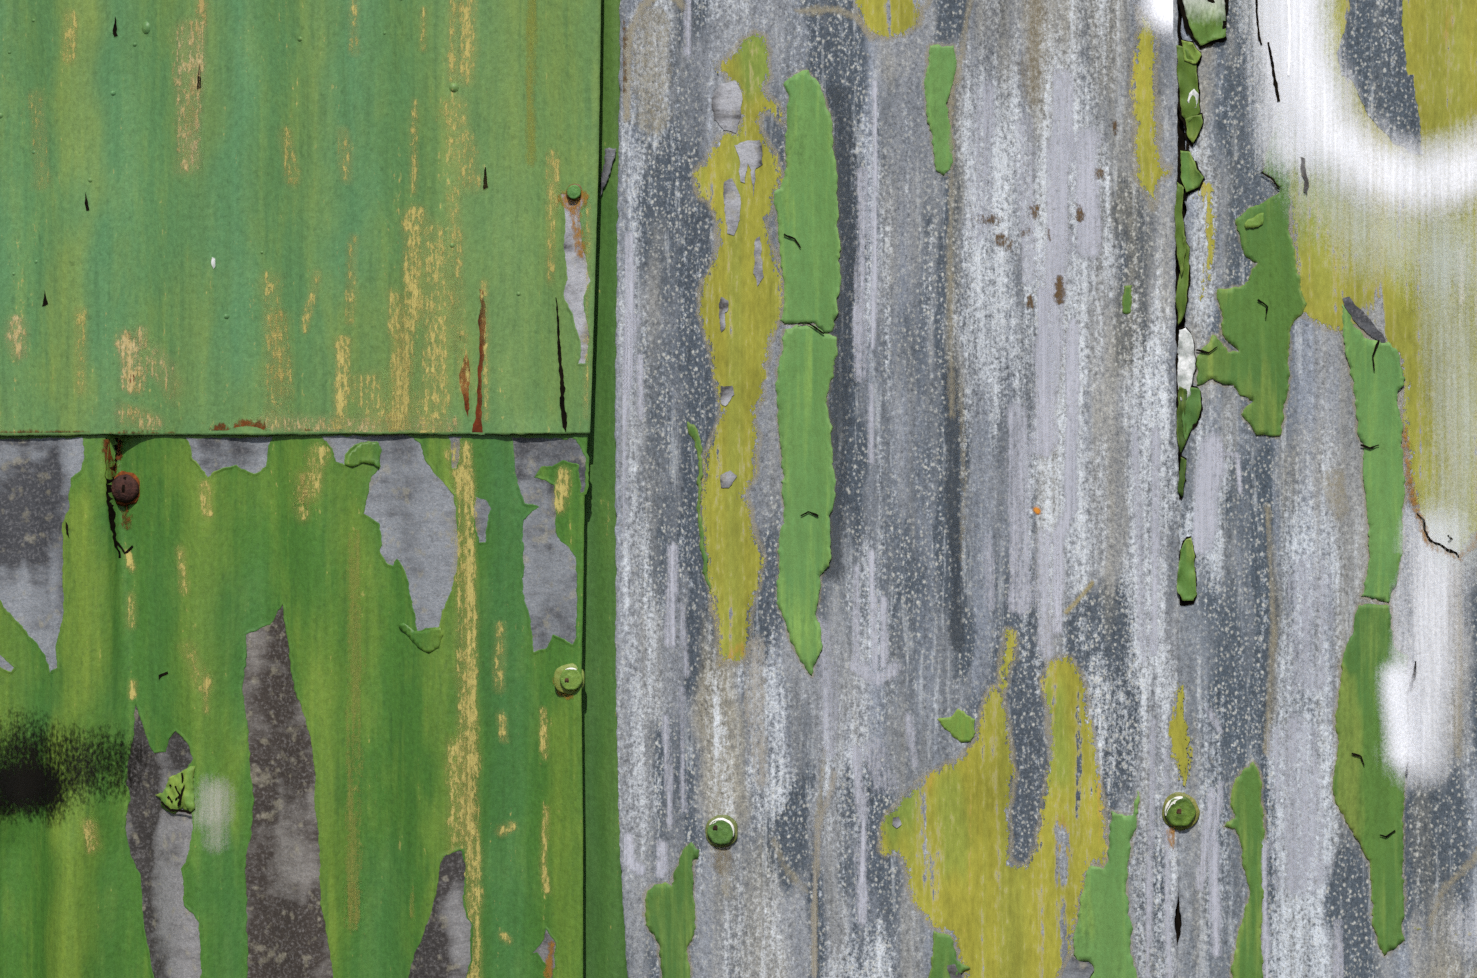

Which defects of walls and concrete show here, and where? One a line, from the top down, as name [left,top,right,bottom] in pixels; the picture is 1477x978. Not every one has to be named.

crack [1177,0,1291,102]
rust [457,287,489,435]
crack [556,298,567,432]
peeling [753,70,841,676]
crack [1175,106,1189,408]
peeling [1174,0,1309,500]
peeling [0,437,88,676]
peeling [322,434,494,632]
peeling [510,436,589,655]
peeling [1333,297,1408,956]
peeling [238,600,337,978]
crack [1174,895,1182,944]